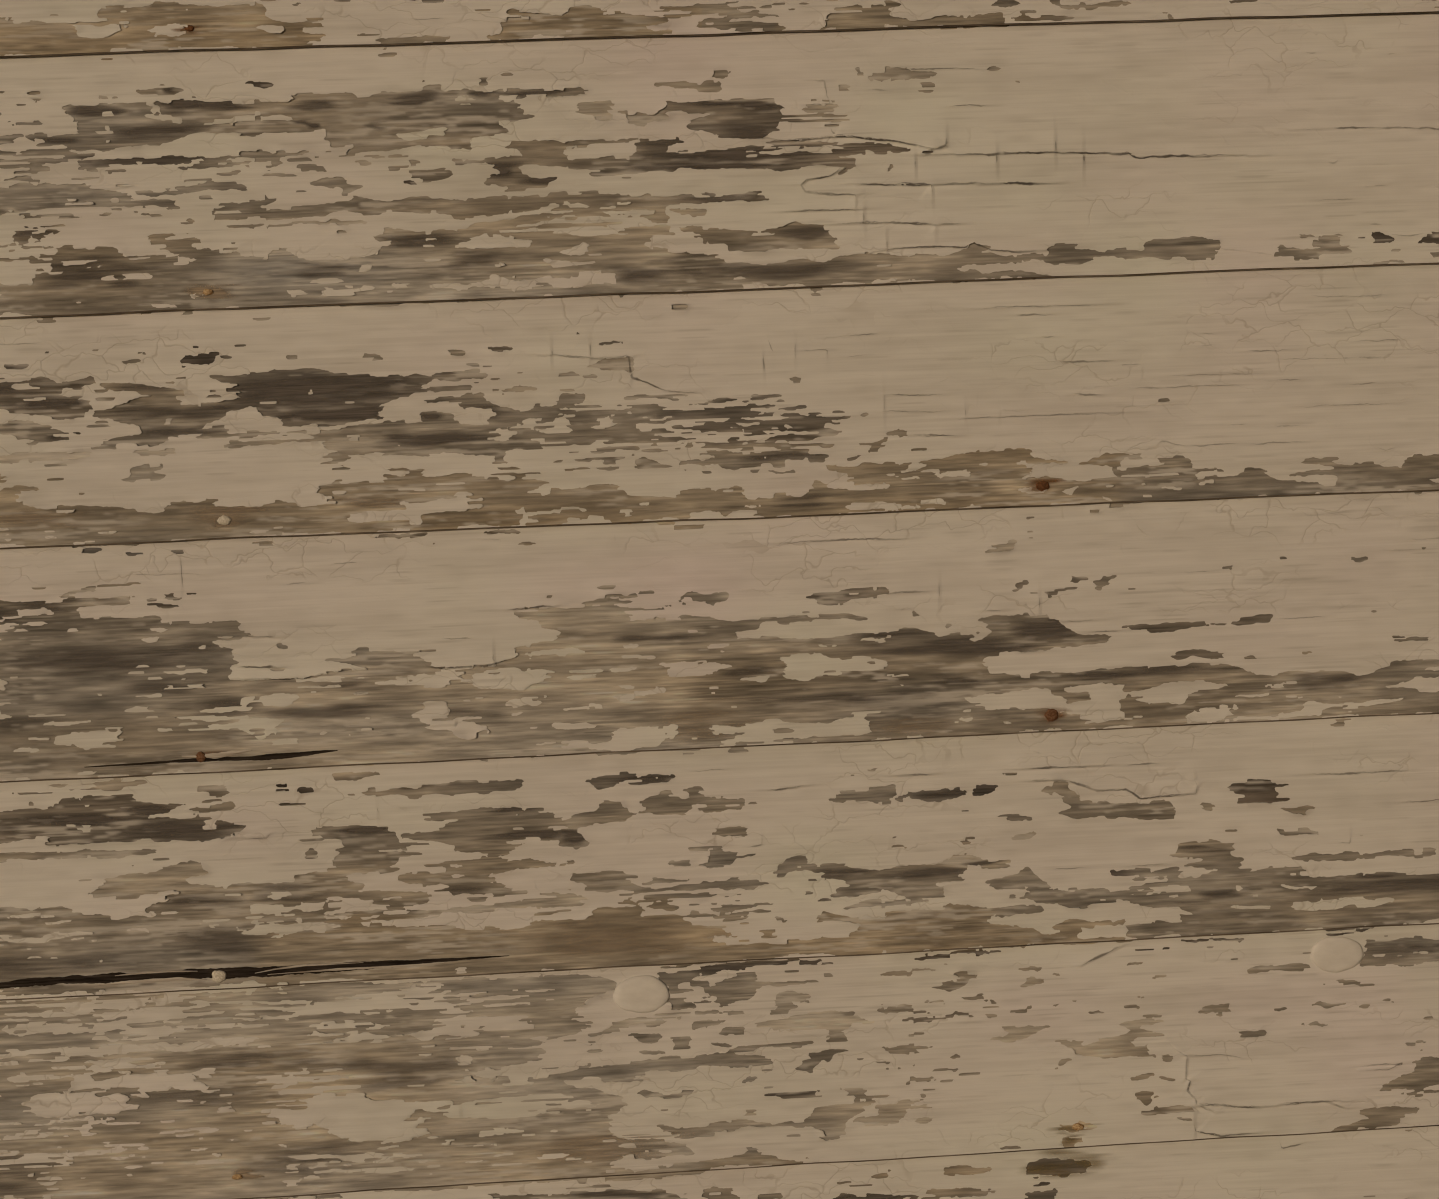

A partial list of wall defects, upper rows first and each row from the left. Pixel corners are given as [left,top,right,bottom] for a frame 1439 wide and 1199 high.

peeling [0,0,326,60]
peeling [357,33,450,57]
peeling [475,1,810,40]
peeling [820,0,1131,30]
peeling [0,66,1221,323]
peeling [0,341,1439,556]
spalling [1012,575,1135,598]
peeling [0,582,1439,1199]